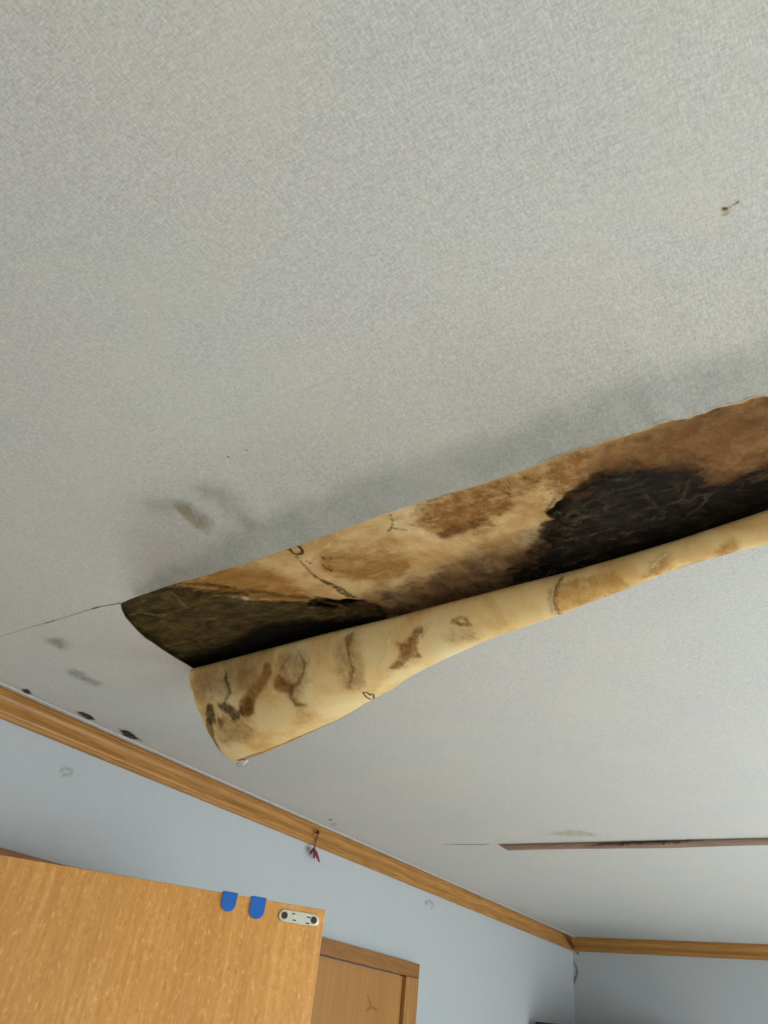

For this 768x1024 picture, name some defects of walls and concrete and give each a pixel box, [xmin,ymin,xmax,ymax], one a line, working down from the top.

damp [121,462,768,673]